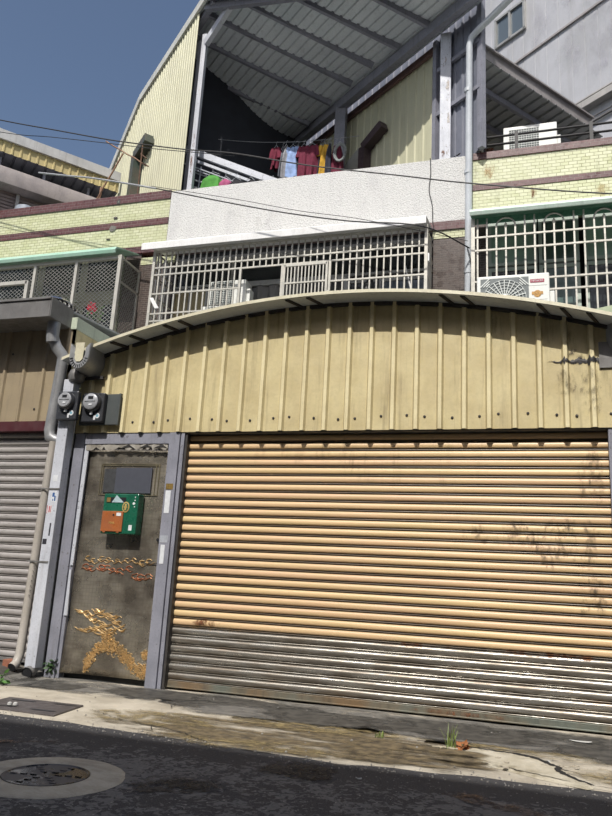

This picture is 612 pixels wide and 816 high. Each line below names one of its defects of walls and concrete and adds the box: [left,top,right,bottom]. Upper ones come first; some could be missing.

leakage [0,661,612,784]
crack [472,747,607,788]